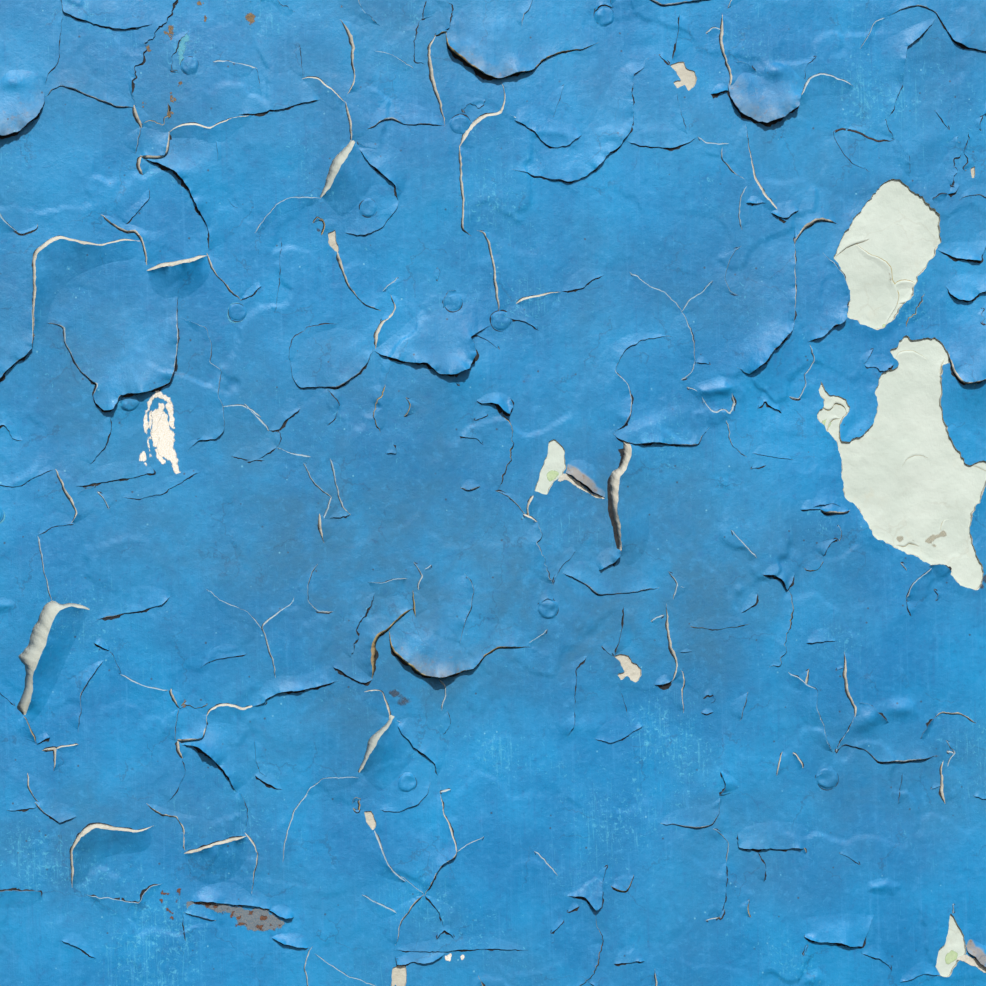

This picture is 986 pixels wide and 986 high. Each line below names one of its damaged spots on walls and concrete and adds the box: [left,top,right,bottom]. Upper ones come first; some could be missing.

peeling [17,601,89,722]
crack [0,319,436,728]
crack [40,0,604,349]
peeling [535,332,708,565]
peeling [614,654,641,682]
crack [459,410,889,778]
peeling [670,62,697,91]
crack [627,94,837,469]
peeling [731,179,986,590]
corrosion [160,888,284,931]
crack [182,769,526,953]
peeling [935,914,986,977]